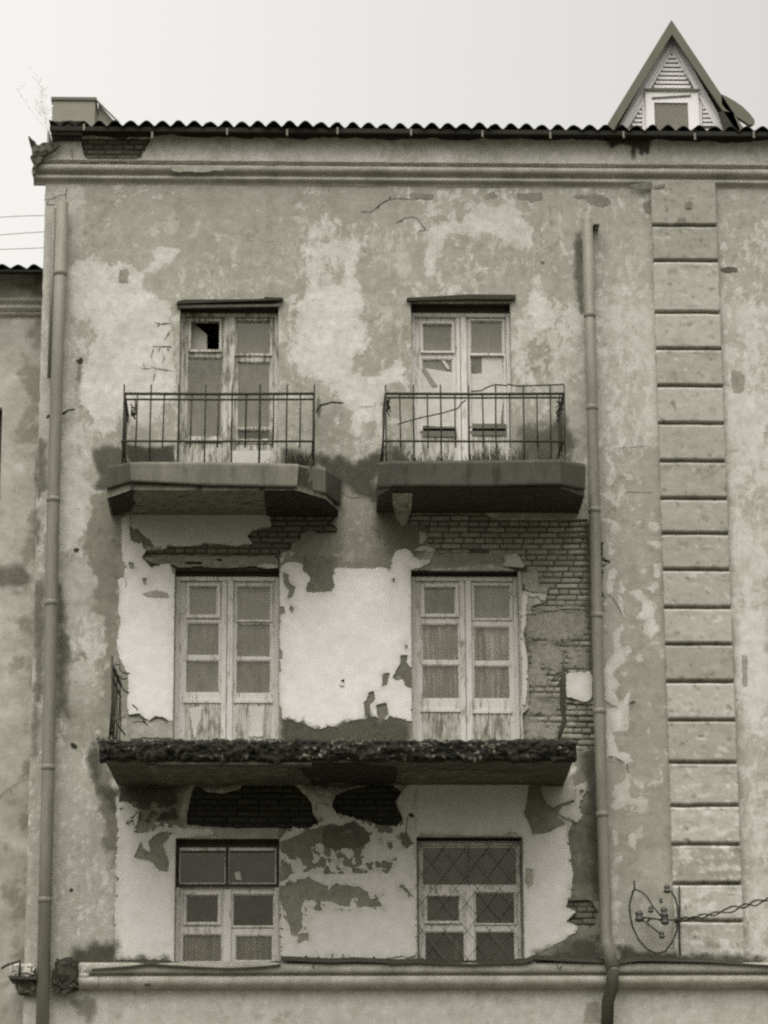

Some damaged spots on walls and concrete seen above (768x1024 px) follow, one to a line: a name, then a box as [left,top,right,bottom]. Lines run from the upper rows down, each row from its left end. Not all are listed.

peeling [44,184,667,962]
crack [360,196,426,232]